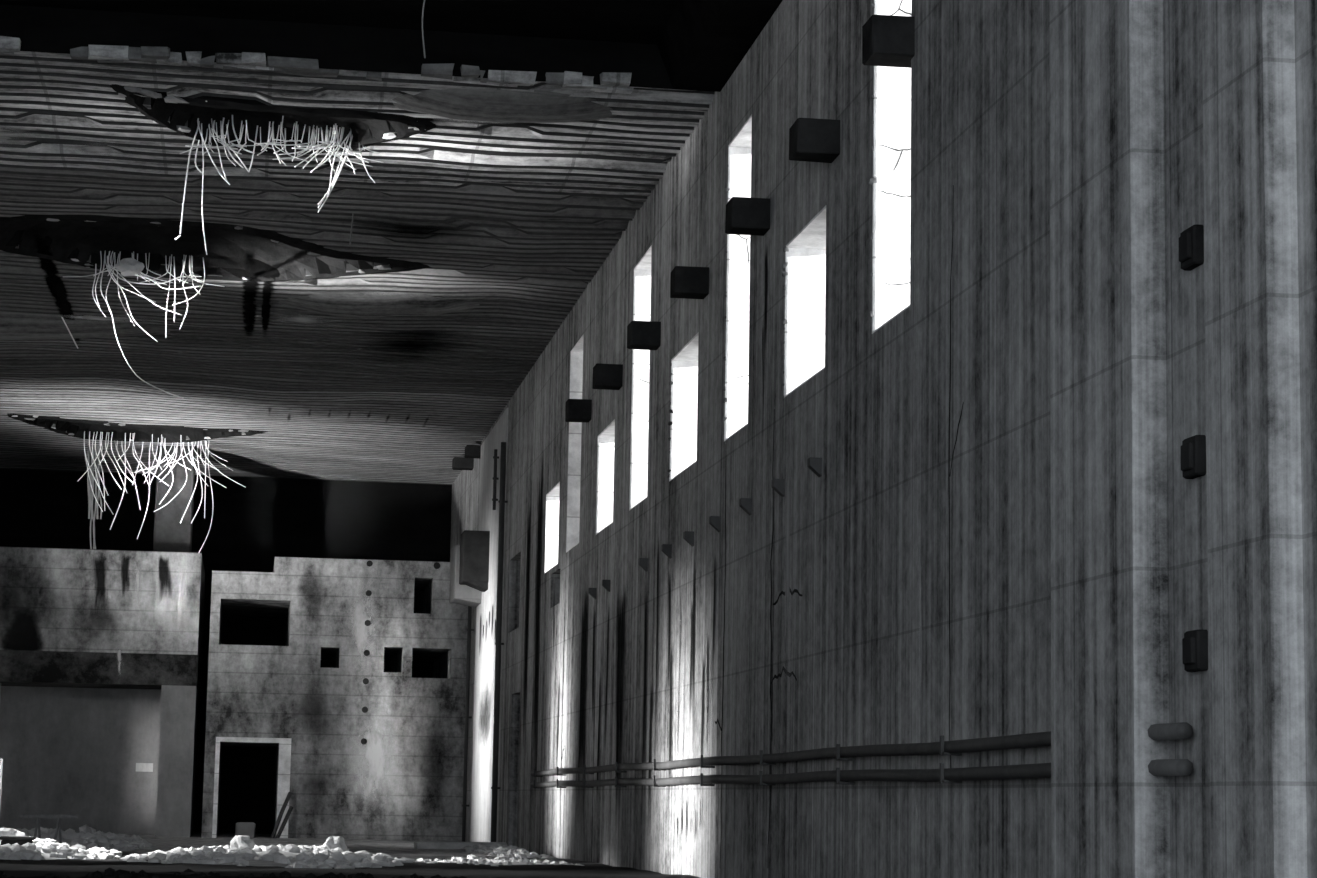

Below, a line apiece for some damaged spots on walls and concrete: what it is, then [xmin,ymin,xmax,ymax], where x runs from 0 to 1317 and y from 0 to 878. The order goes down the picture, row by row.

spalling [0,84,437,398]
spalling [7,414,268,552]
leakage [89,558,112,629]
leakage [121,556,130,592]
leakage [158,557,185,603]
leakage [354,601,372,655]
leakage [358,732,392,795]